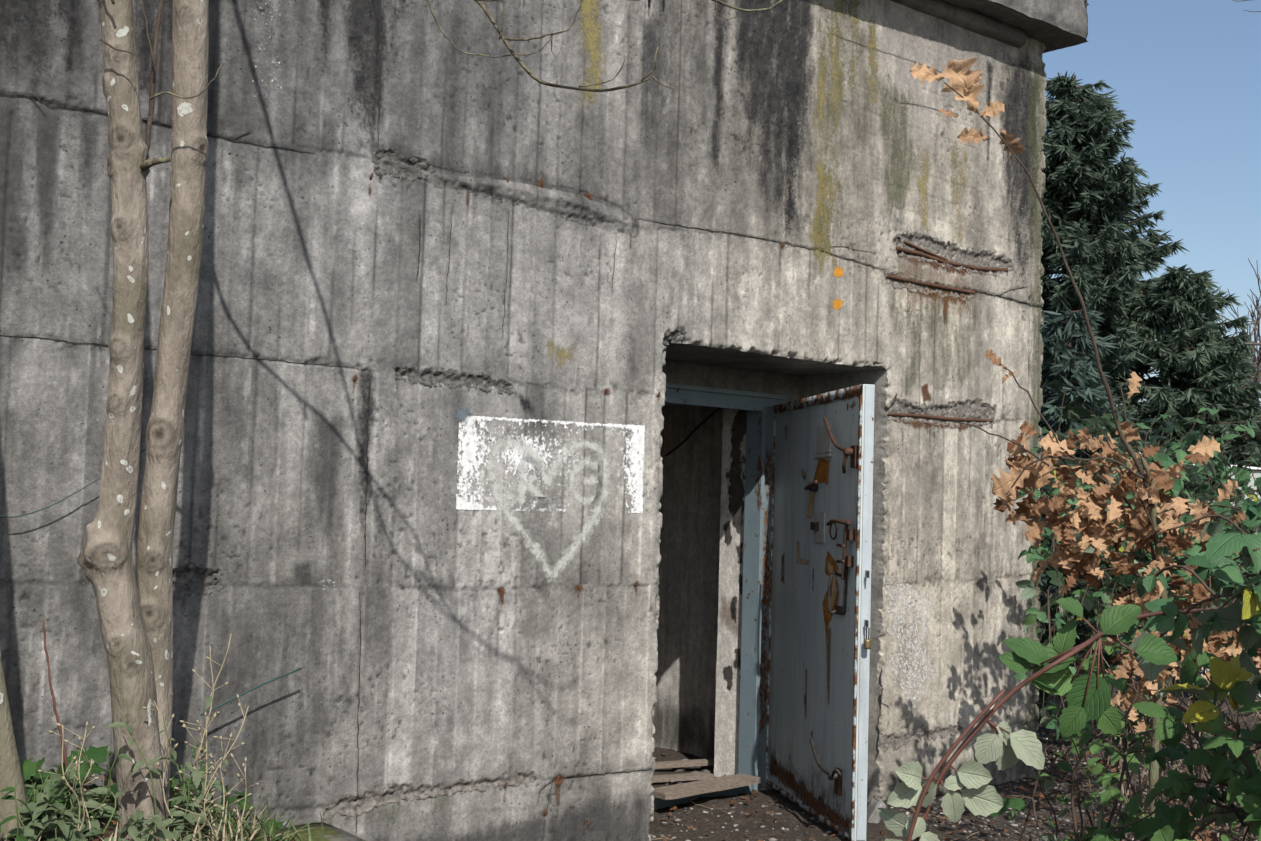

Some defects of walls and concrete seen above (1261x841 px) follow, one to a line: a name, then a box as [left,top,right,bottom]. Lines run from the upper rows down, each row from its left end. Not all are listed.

crack [0,94,108,115]
water stain [137,0,172,89]
crack [207,133,309,153]
water stain [348,0,397,149]
water stain [699,0,838,269]
corrosion [915,286,976,323]
spalling [884,190,1024,341]
spalling [884,397,997,429]
peeling [723,410,747,623]
corrosion [755,452,785,733]
peeling [723,649,741,689]
corrosion [769,755,851,834]